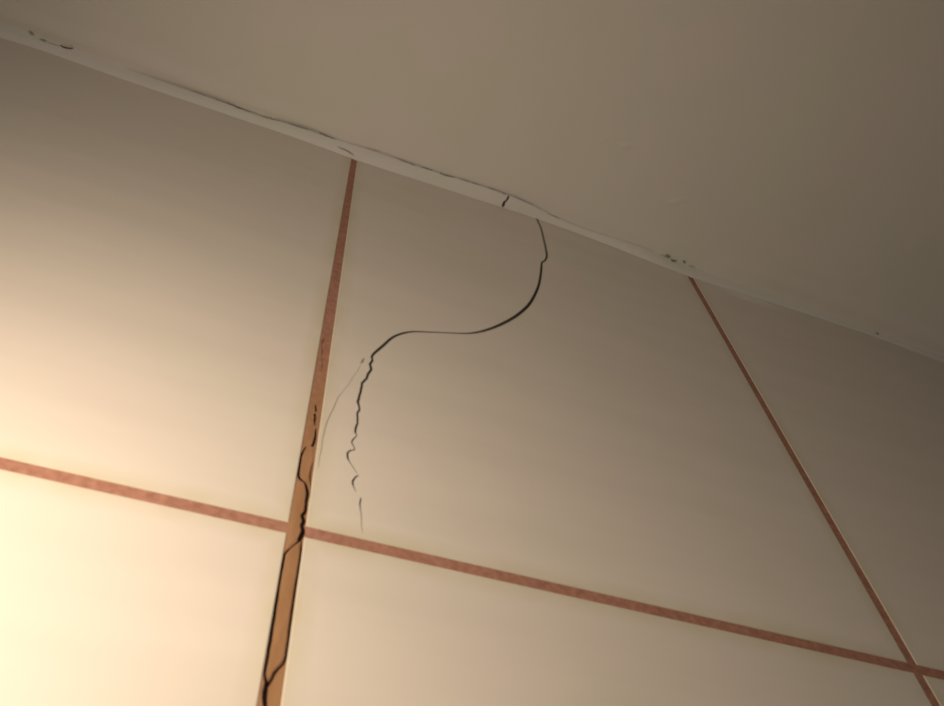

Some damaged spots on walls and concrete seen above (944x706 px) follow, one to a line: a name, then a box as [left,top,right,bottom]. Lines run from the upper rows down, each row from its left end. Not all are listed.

crack [462,239,548,334]
crack [347,331,427,521]
crack [262,405,316,706]